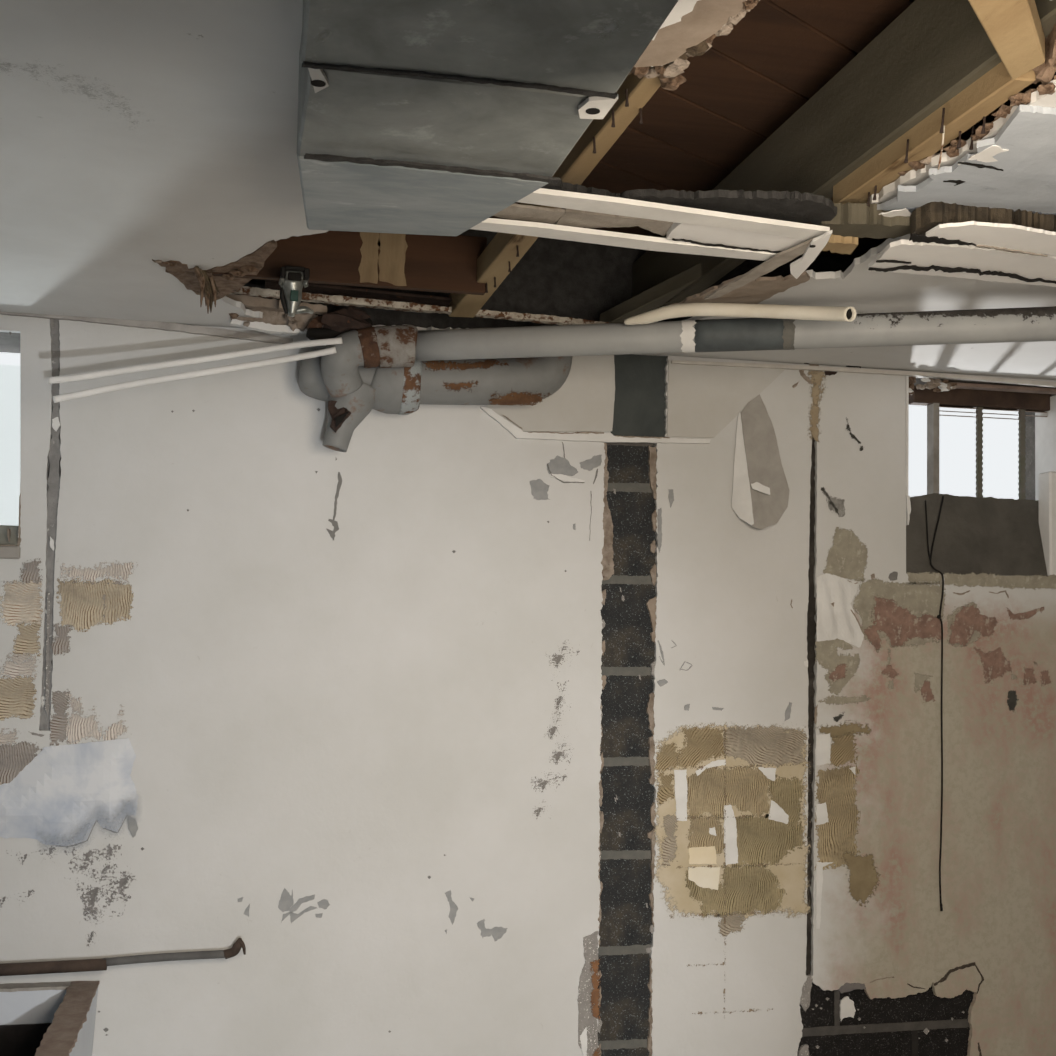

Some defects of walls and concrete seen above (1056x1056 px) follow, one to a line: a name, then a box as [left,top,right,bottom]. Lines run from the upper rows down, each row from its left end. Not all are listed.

peeling [628,0,760,79]
spalling [898,23,1056,176]
rust [356,327,380,368]
rust [398,359,508,415]
rust [488,391,551,406]
peeling [731,394,790,529]
damp [815,638,871,738]
damp [1007,690,1019,711]
peeling [674,759,726,821]
peeling [688,805,738,890]
damp [842,852,880,907]
spalling [797,974,974,1056]